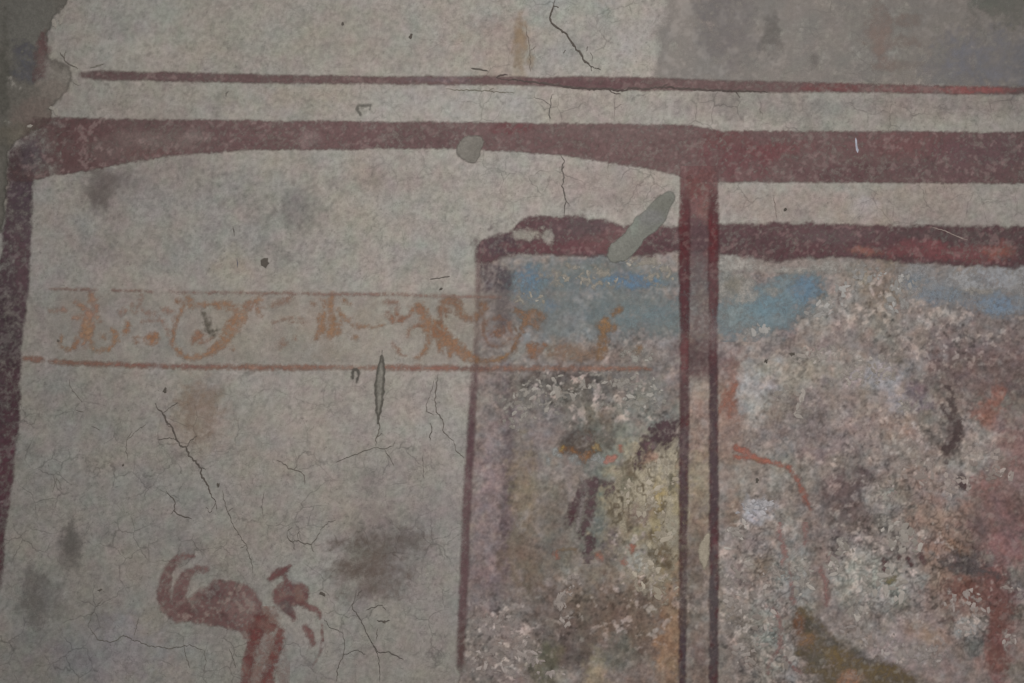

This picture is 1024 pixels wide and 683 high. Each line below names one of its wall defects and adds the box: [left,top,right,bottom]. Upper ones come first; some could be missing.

crack [452,1,766,118]
flaking render [0,0,81,232]
crack [561,156,569,214]
crack [125,402,253,572]
crack [337,423,394,465]
spalling [374,355,385,424]
crack [422,375,464,477]
crack [287,520,335,552]
crack [88,599,236,669]
crack [324,590,402,681]